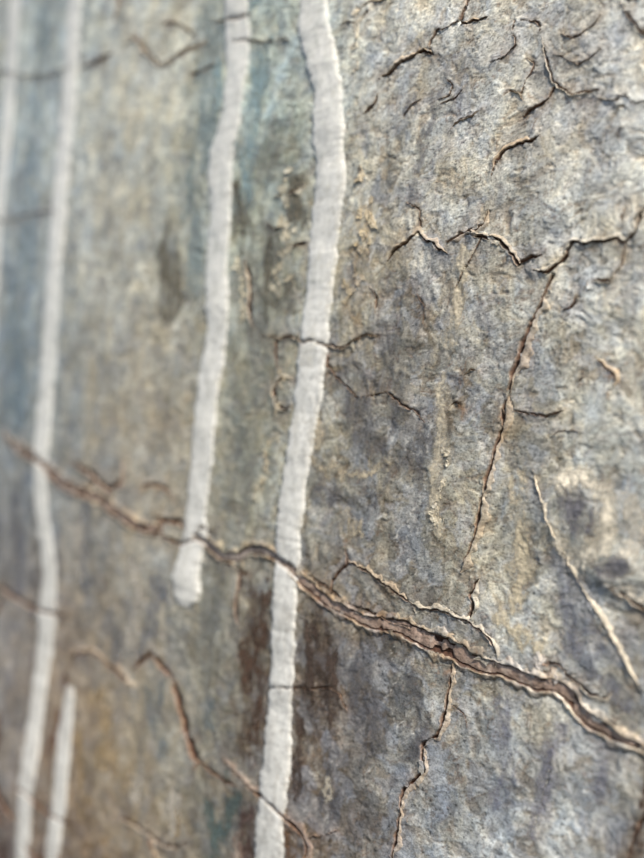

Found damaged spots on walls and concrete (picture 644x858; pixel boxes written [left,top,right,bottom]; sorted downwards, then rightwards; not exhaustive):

crack [0,13,289,81]
damp [157,157,203,320]
damp [197,6,223,166]
damp [231,52,268,253]
damp [264,238,273,287]
damp [286,174,305,228]
crack [363,0,488,114]
crack [403,78,479,129]
crack [490,15,644,175]
crack [621,0,644,35]
crack [0,202,644,858]
damp [320,765,335,813]